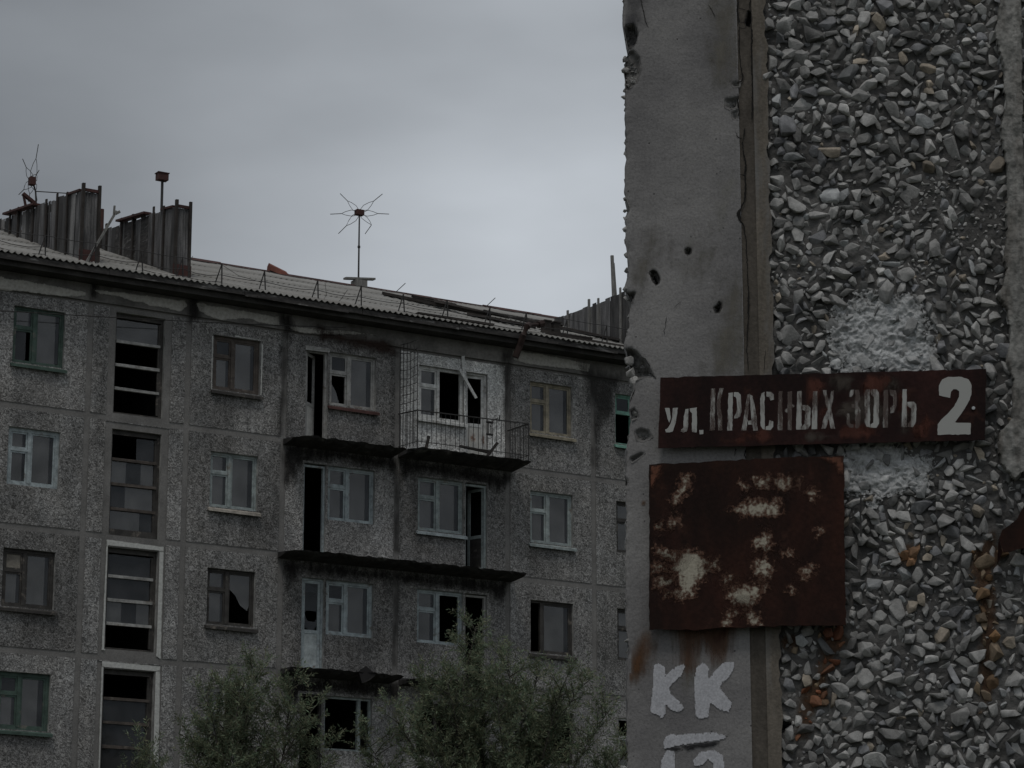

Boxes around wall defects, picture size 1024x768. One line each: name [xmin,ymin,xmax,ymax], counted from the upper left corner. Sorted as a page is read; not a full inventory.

spalling [624,24,642,89]
crack [709,0,766,369]
spalling [626,348,655,381]
corrosion [968,533,1009,714]
corrosion [629,636,651,680]